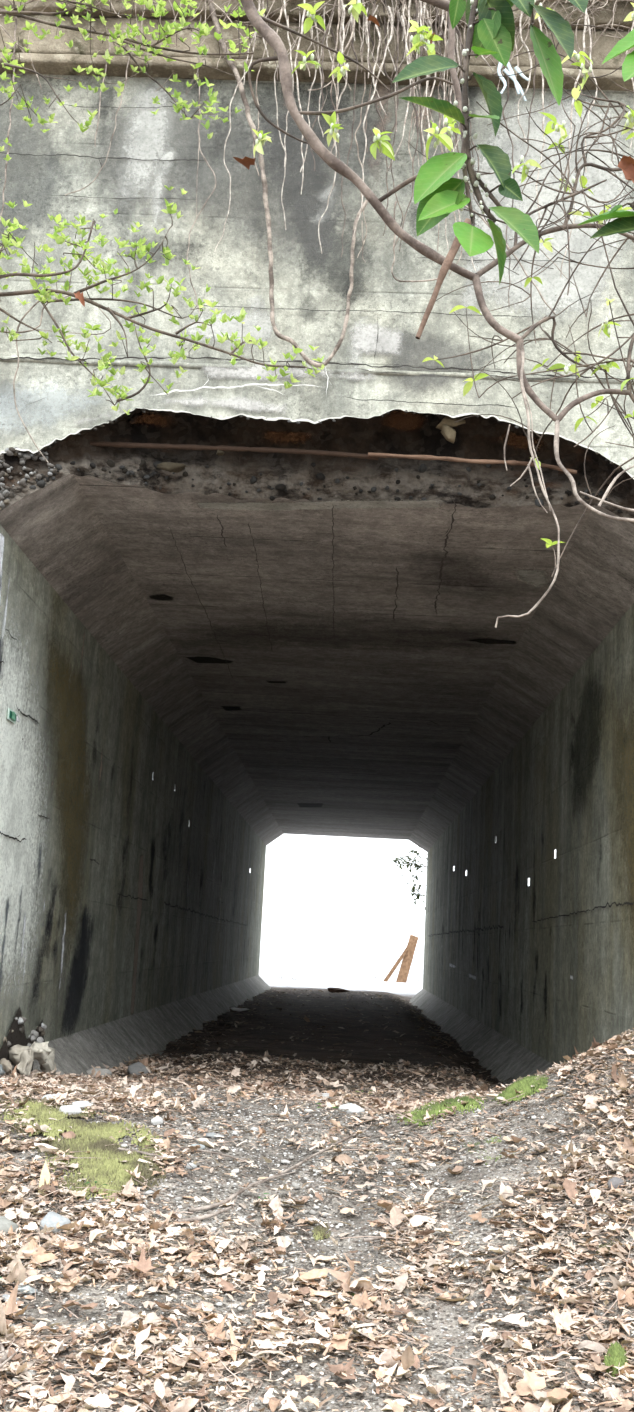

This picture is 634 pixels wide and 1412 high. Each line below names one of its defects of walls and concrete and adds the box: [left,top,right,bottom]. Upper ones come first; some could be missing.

leakage [129,87,173,215]
leakage [258,89,369,304]
leakage [186,297,272,344]
peeling [205,365,374,380]
spalling [0,398,634,525]
crack [434,502,457,614]
crack [0,814,50,842]
leakage [0,533,94,1034]
crack [428,902,634,936]